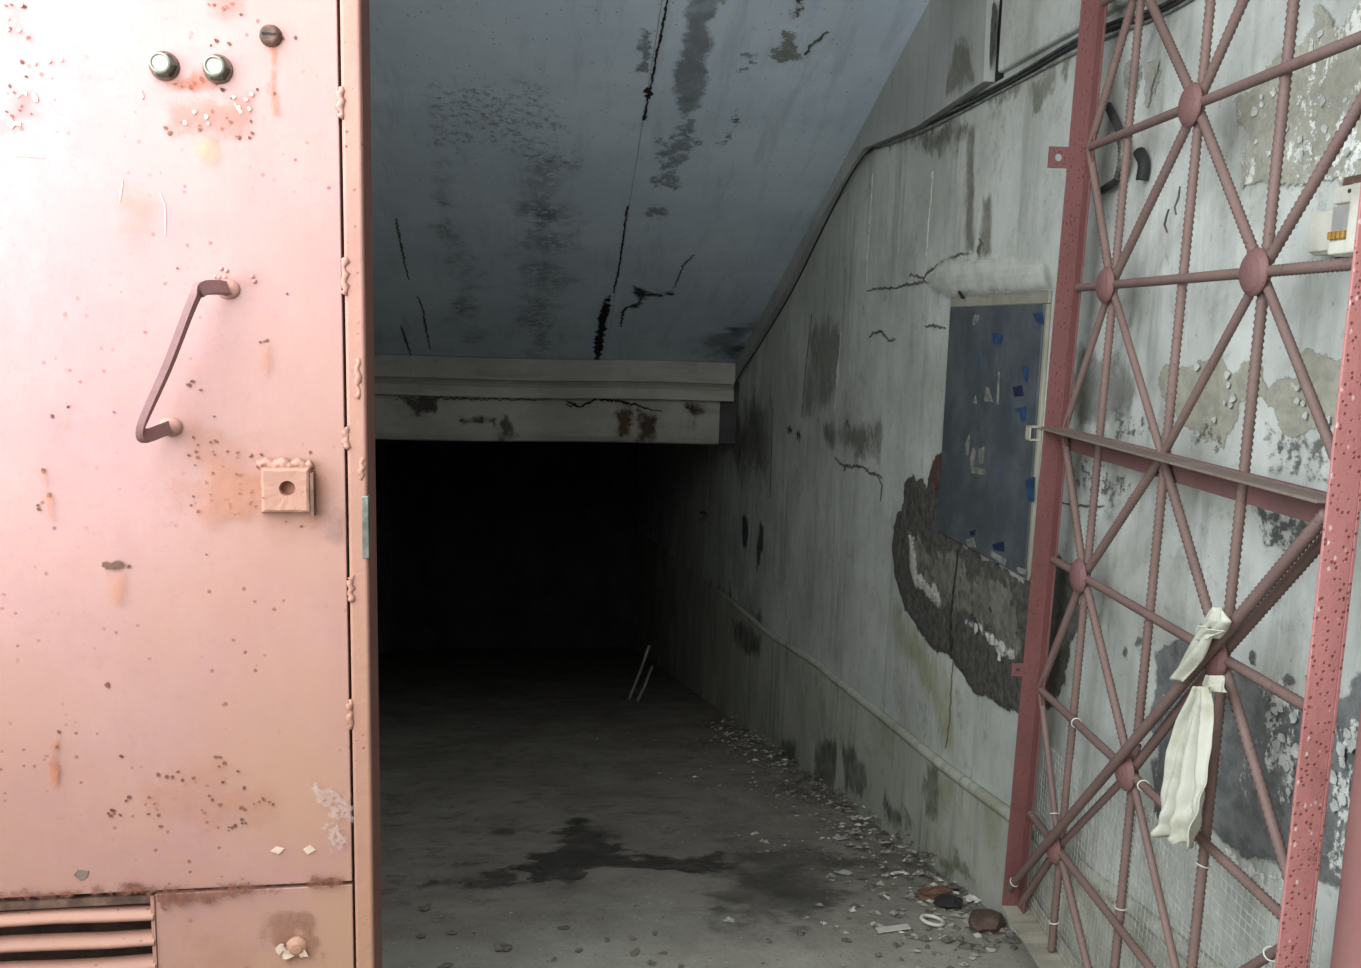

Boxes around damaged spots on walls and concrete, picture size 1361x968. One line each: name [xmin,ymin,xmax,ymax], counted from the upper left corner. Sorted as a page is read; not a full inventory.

crack [642,0,668,120]
leakage [651,0,725,191]
crack [613,206,629,293]
crack [672,255,695,289]
crack [866,252,969,292]
crack [835,457,883,501]
flaking render [892,0,1361,968]